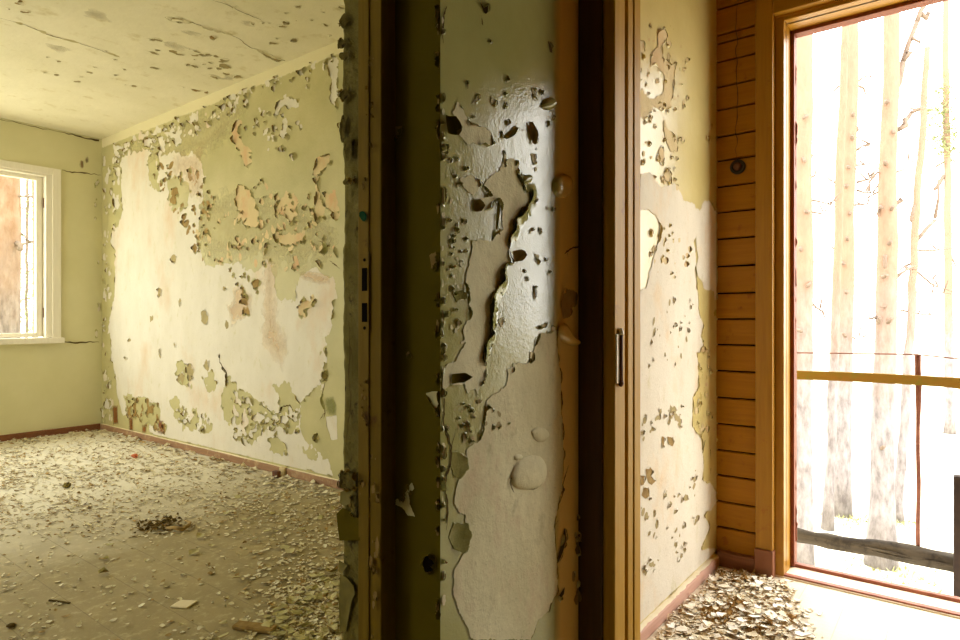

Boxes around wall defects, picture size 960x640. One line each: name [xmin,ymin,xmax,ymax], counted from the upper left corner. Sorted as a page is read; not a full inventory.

crack [1,18,119,57]
crack [165,17,285,61]
peeling [94,5,380,517]
peeling [420,75,582,640]
peeling [640,15,718,622]